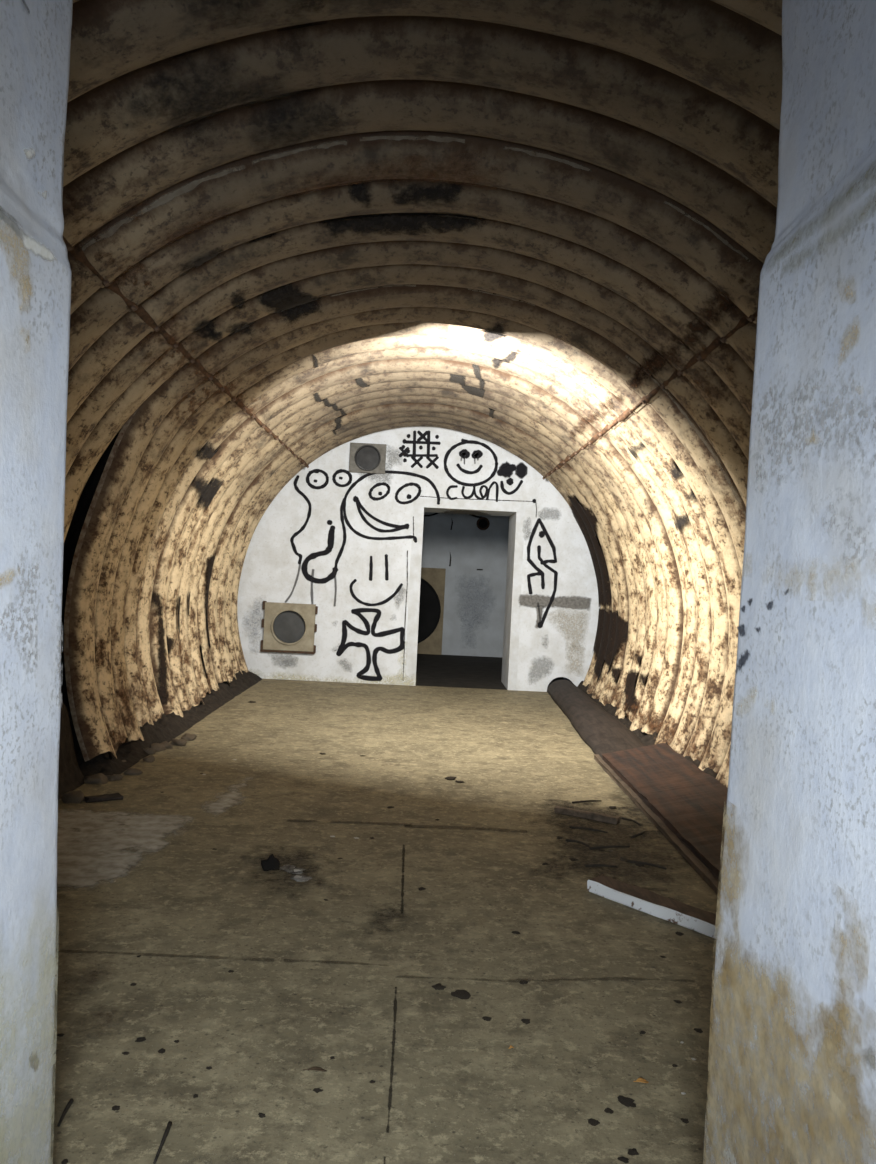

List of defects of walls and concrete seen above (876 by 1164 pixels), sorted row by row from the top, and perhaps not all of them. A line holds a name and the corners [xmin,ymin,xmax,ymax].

peeling [82,135,465,251]
peeling [504,147,590,171]
rust [604,684,713,758]
water stain [715,813,740,928]
water stain [703,947,875,1164]